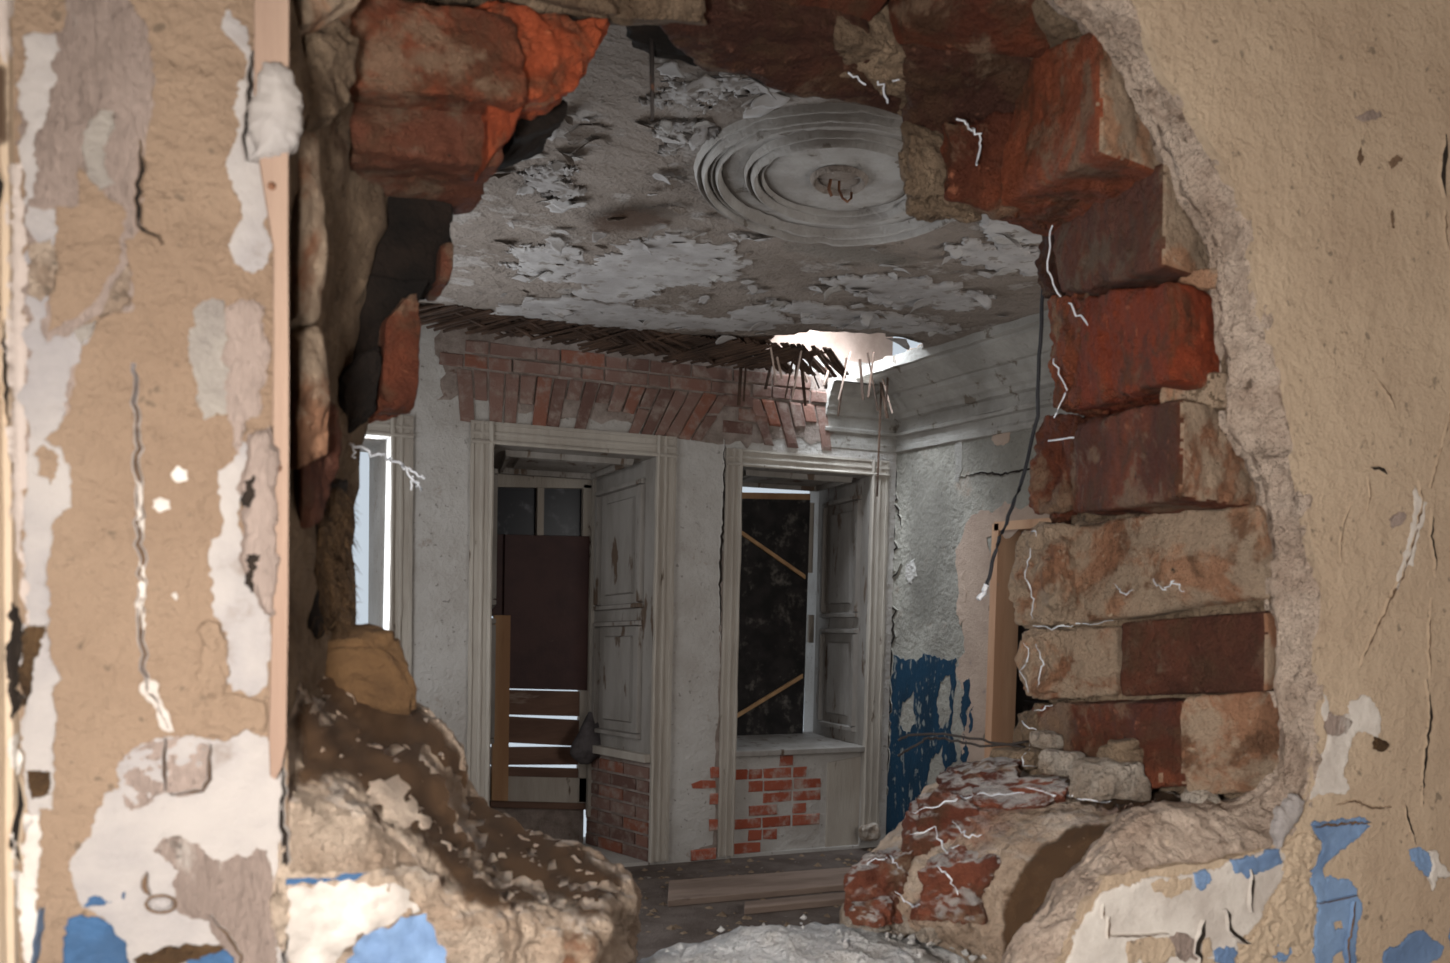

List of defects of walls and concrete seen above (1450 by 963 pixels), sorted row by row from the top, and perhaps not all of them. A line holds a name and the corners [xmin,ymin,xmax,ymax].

crack [133,139,165,246]
peeling [221,9,272,274]
spalling [434,60,1042,451]
crack [1438,134,1449,250]
peeling [0,0,156,963]
crack [130,363,174,732]
peeling [188,298,281,697]
peeling [62,677,650,963]
spalling [690,551,824,861]
crack [959,467,1030,478]
spalling [863,0,1389,963]
crack [1335,412,1450,845]